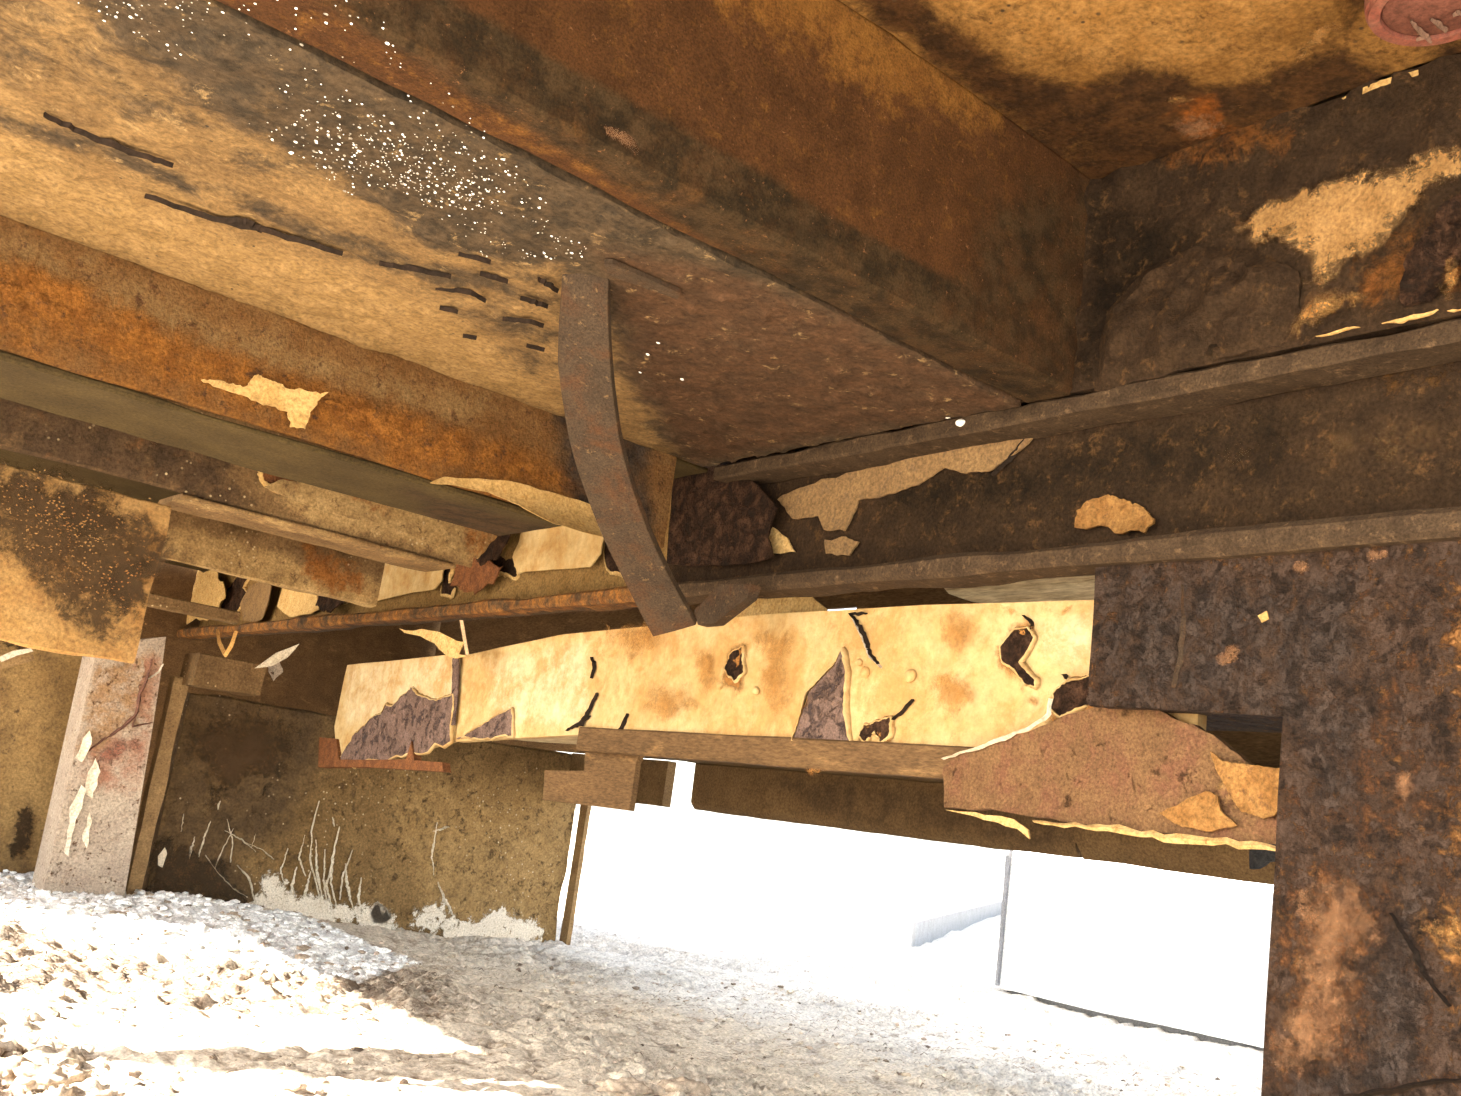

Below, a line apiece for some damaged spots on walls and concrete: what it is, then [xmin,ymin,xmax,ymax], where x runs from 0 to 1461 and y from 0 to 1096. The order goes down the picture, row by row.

corrosion [606,127,637,150]
peeling [201,374,328,429]
leakage [16,473,123,533]
corrosion [257,471,297,494]
peeling [430,477,604,574]
peeling [777,438,1033,556]
leakage [109,563,153,612]
peeling [791,646,853,741]
corrosion [1398,773,1414,798]
peeling [948,791,1276,851]
corrosion [1275,883,1378,1076]
crack [1342,1078,1461,1096]